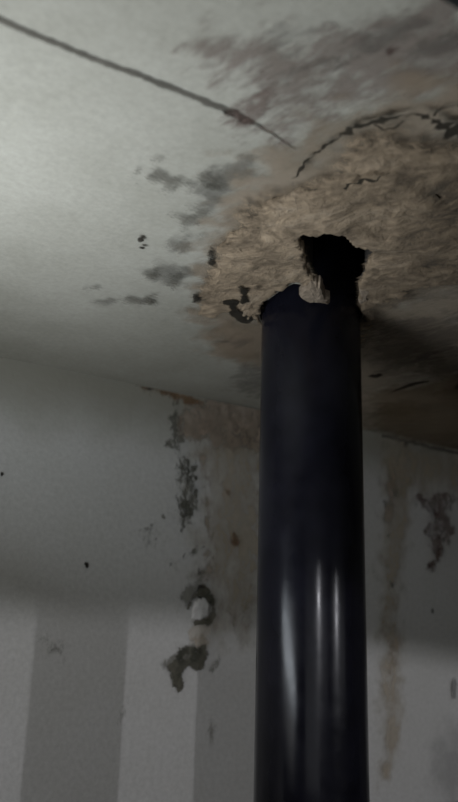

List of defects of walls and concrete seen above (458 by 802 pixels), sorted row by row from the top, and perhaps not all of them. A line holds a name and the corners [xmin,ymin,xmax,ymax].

crack [0,17,458,178]
damp [182,86,458,228]
damp [143,266,208,287]
damp [214,313,262,364]
spalling [192,128,458,348]
damp [359,285,458,449]
damp [175,454,206,533]
spalling [164,567,219,693]